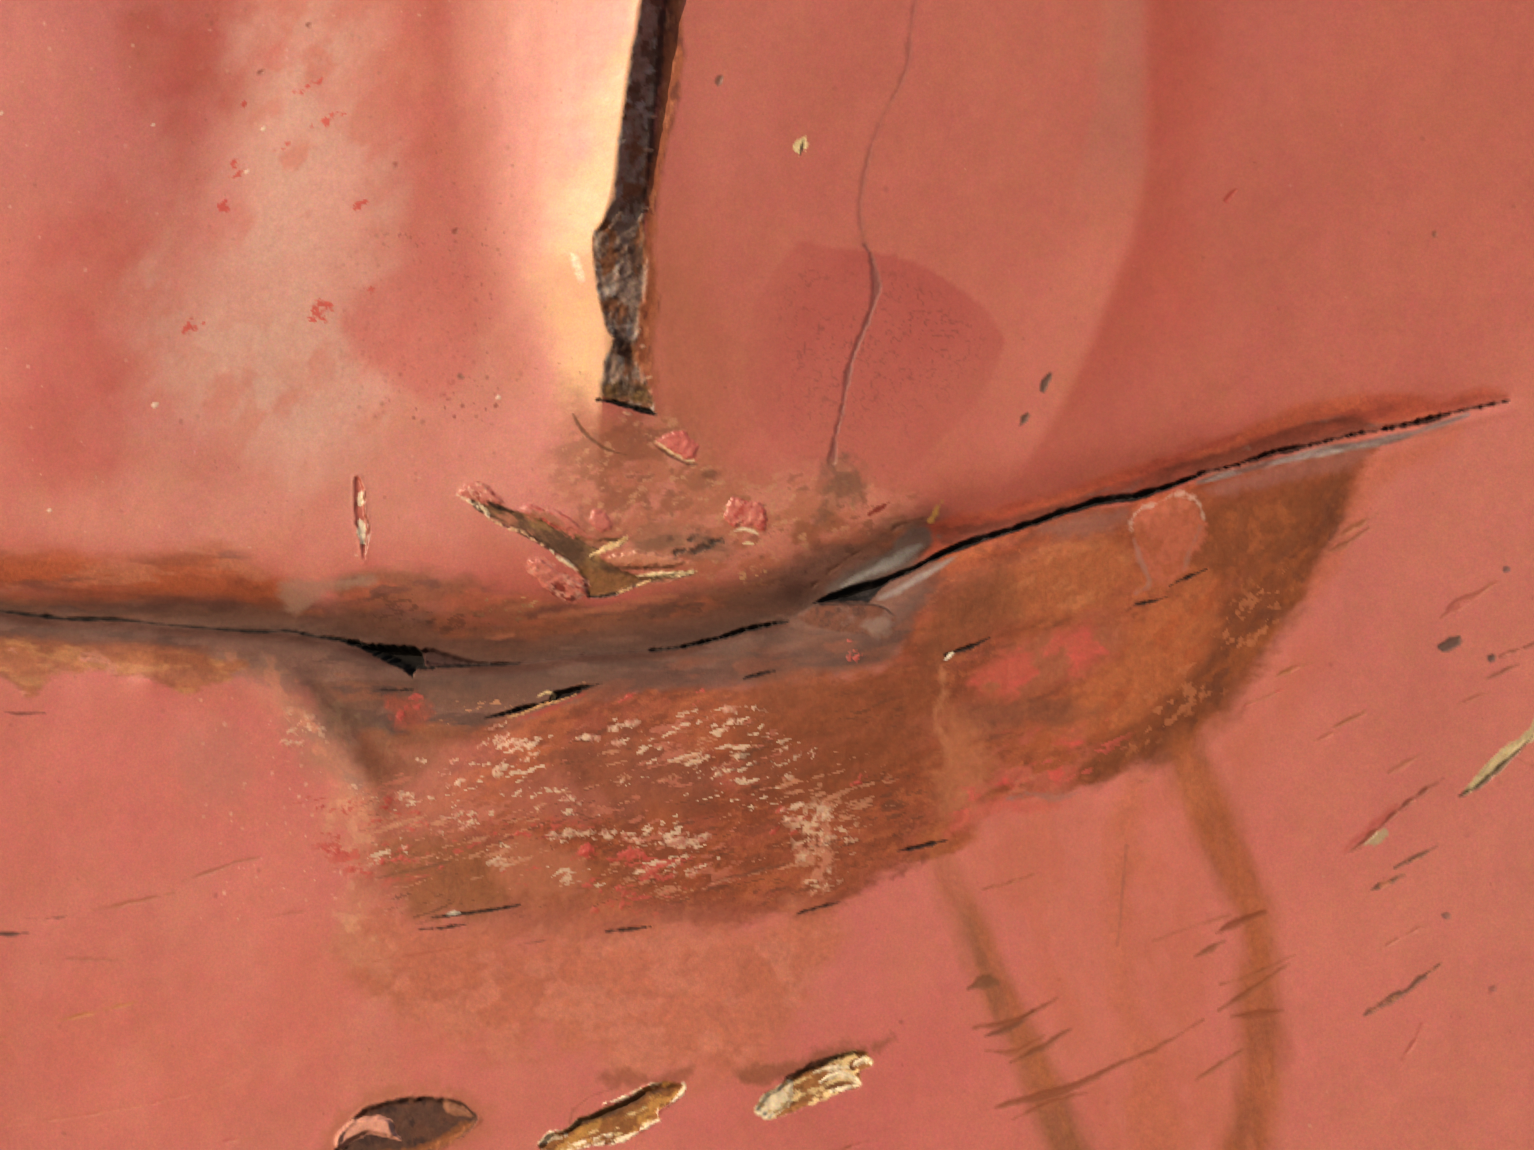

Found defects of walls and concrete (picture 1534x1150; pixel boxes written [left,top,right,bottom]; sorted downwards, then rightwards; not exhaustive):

corrosion [633,0,688,392]
crack [808,0,920,535]
corrosion [0,533,291,613]
peeling [454,481,701,605]
crack [0,398,1511,679]
corrosion [0,634,251,702]
corrosion [279,706,330,749]
corrosion [288,382,1511,1150]
peeling [1342,714,1534,857]
peeling [333,1094,482,1150]
peeling [536,1083,687,1150]
peeling [753,1049,876,1122]